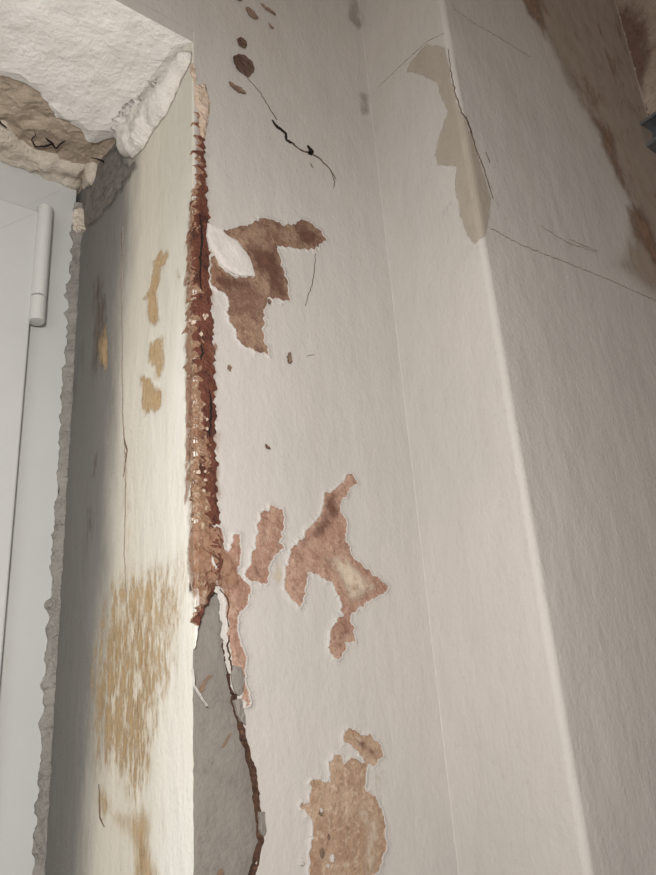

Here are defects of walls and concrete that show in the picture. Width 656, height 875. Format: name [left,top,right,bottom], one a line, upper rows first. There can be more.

peeling [0,50,192,226]
crack [247,78,336,188]
peeling [408,45,490,242]
water stain [535,0,656,286]
rust [182,63,238,626]
peeling [206,213,330,362]
peeling [191,469,393,875]